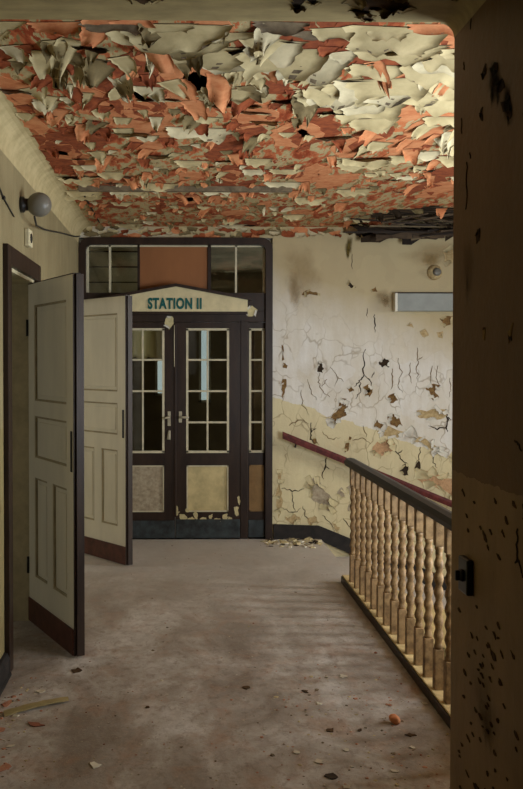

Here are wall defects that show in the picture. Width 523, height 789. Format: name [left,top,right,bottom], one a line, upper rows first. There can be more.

peeling [0,0,454,238]
peeling [325,384,374,429]
crack [289,348,451,479]
flaking render [370,383,475,504]
peeling [176,496,240,519]
flaking render [273,469,356,532]
crack [282,488,350,528]